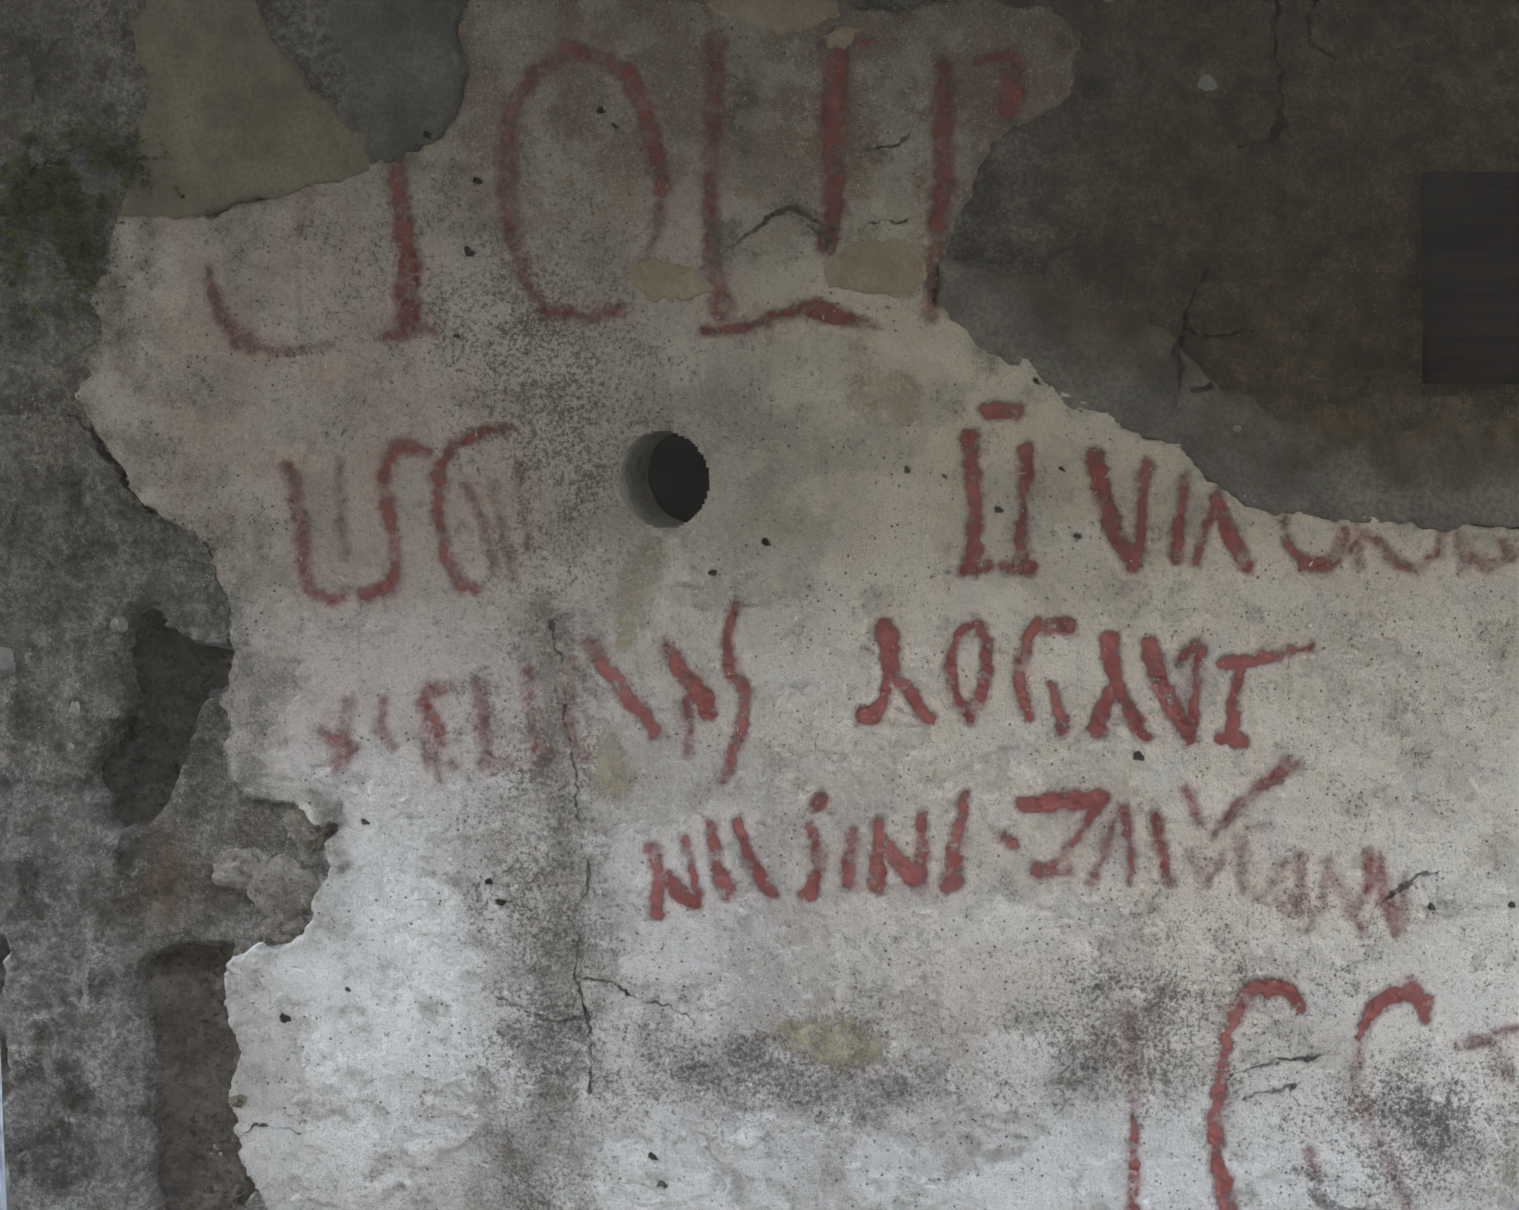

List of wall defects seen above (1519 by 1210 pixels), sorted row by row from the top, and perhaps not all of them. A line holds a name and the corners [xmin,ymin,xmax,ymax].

spalling [1197,74,1217,91]
crack [1238,0,1337,148]
crack [1172,268,1253,398]
spalling [70,701,80,716]
spalling [102,605,235,828]
crack [497,619,683,1094]
spalling [146,943,256,1210]